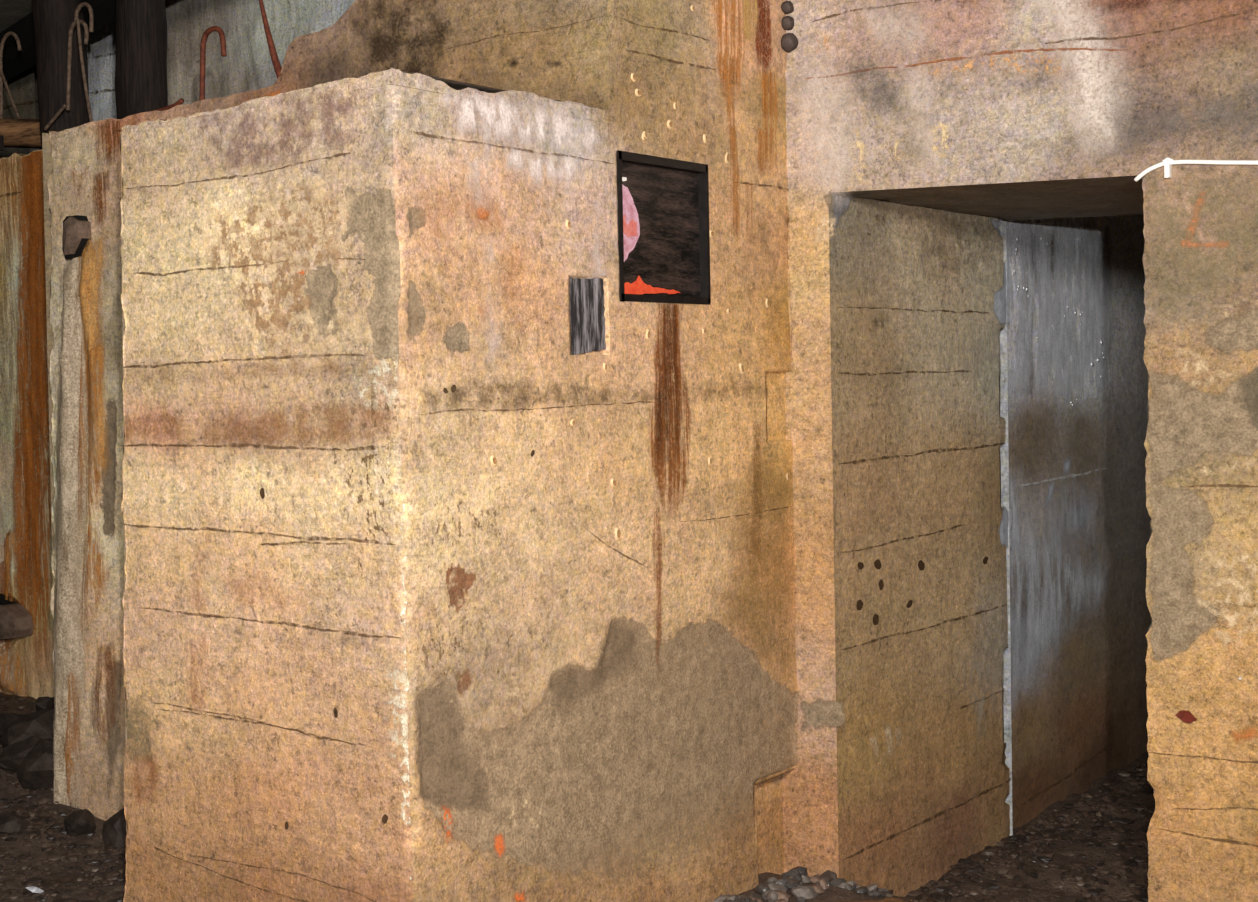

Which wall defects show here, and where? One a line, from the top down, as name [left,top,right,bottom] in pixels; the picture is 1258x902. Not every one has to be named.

rust [714,0,777,224]
rust [0,150,51,646]
rust [654,518,662,645]
rust [651,304,690,498]
spalling [1147,361,1258,660]